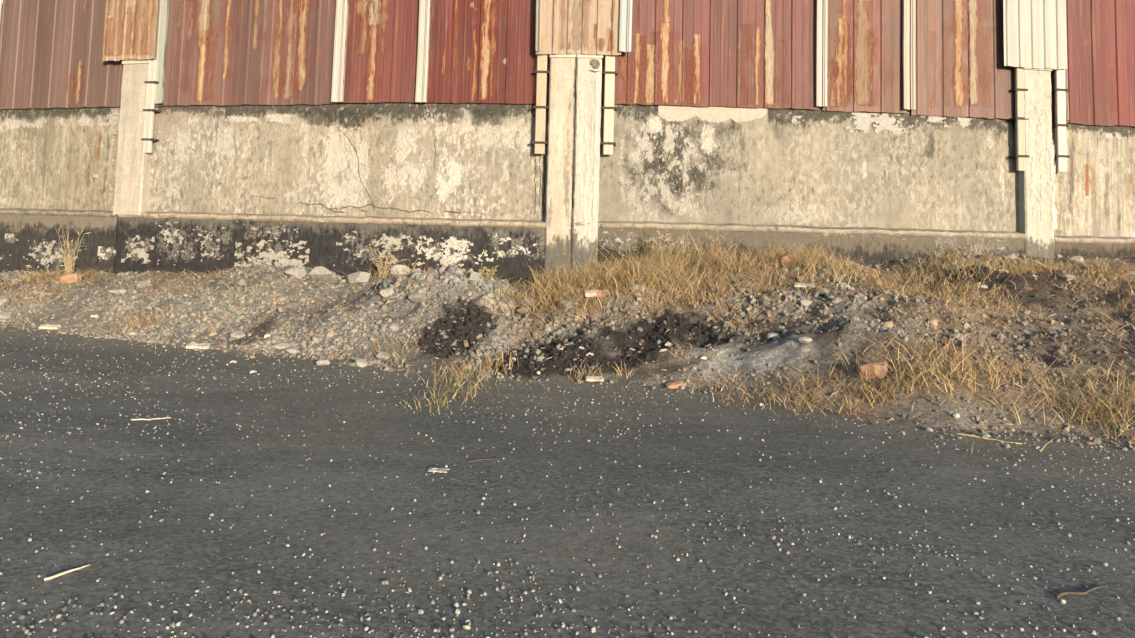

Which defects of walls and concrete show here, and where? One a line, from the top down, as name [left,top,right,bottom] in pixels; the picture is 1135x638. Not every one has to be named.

rust [187,0,232,101]
rust [272,0,310,100]
rust [442,0,507,102]
rust [594,0,700,104]
rust [754,0,776,105]
rust [831,0,874,107]
rust [953,0,979,108]
crack [300,127,483,214]
leakage [616,104,718,218]
leakage [768,108,1015,134]
peeling [5,233,82,283]
peeling [97,221,310,267]